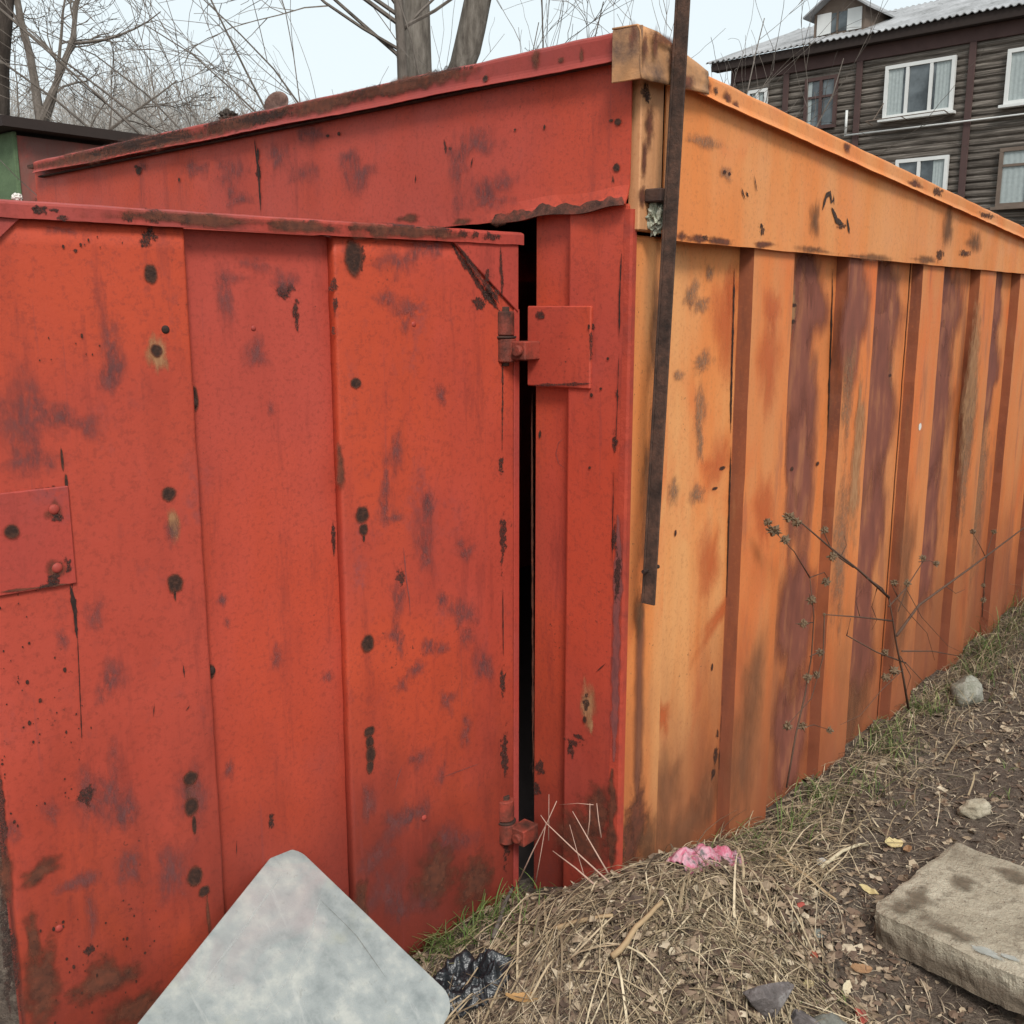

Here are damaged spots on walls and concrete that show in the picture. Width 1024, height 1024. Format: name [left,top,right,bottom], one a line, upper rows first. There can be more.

corrosion [123,212,245,227]
corrosion [268,219,335,232]
corrosion [345,214,469,277]
corrosion [148,340,167,367]
corrosion [356,507,369,542]
corrosion [361,635,374,653]
corrosion [364,726,376,774]
corrosion [558,601,655,866]
corrosion [183,771,202,834]